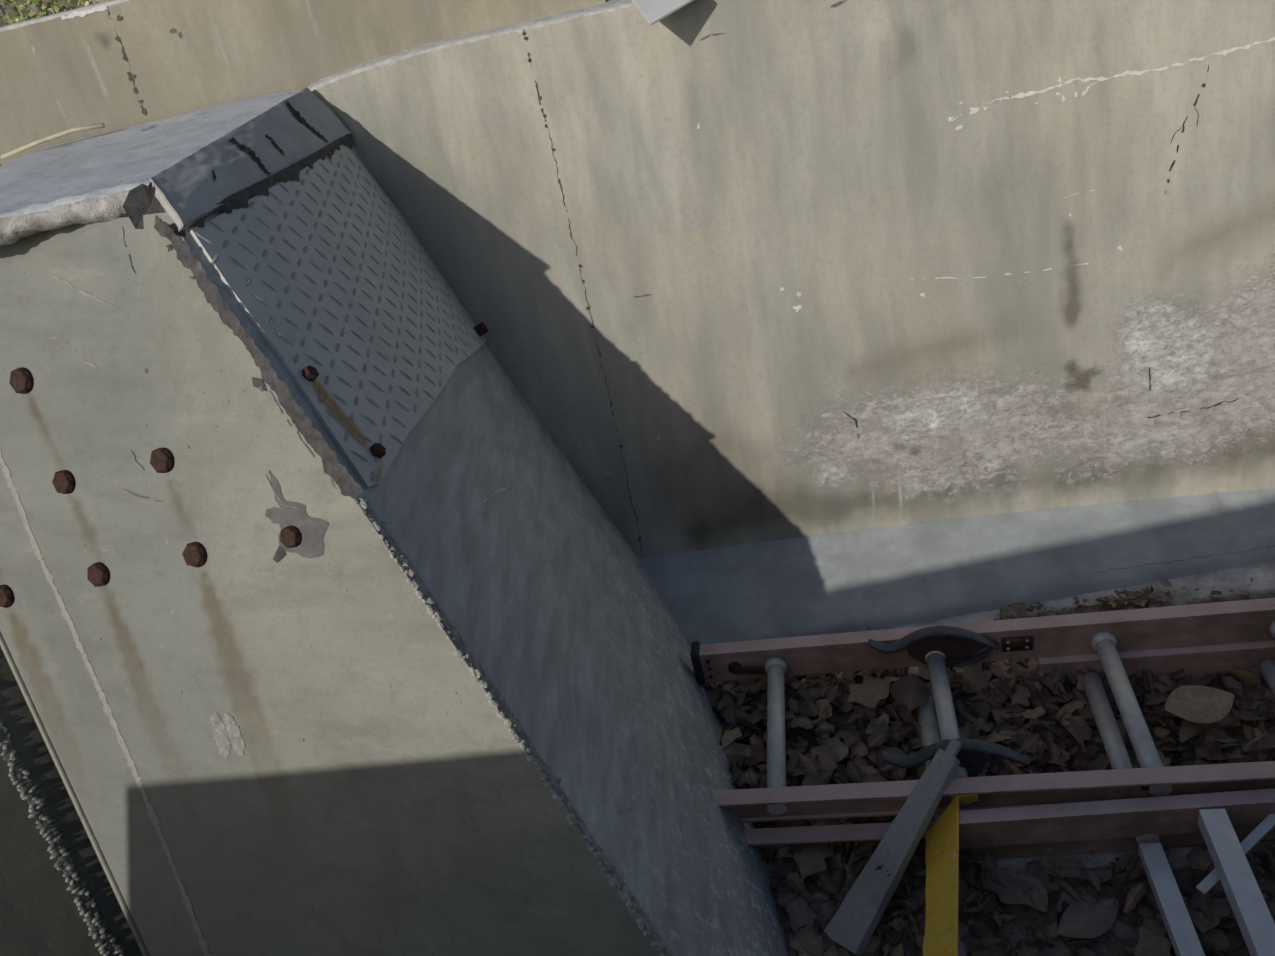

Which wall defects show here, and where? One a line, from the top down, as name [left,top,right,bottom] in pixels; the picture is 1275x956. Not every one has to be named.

crack [522,29,643,552]
crack [1165,65,1209,193]
spalling [154,215,673,956]